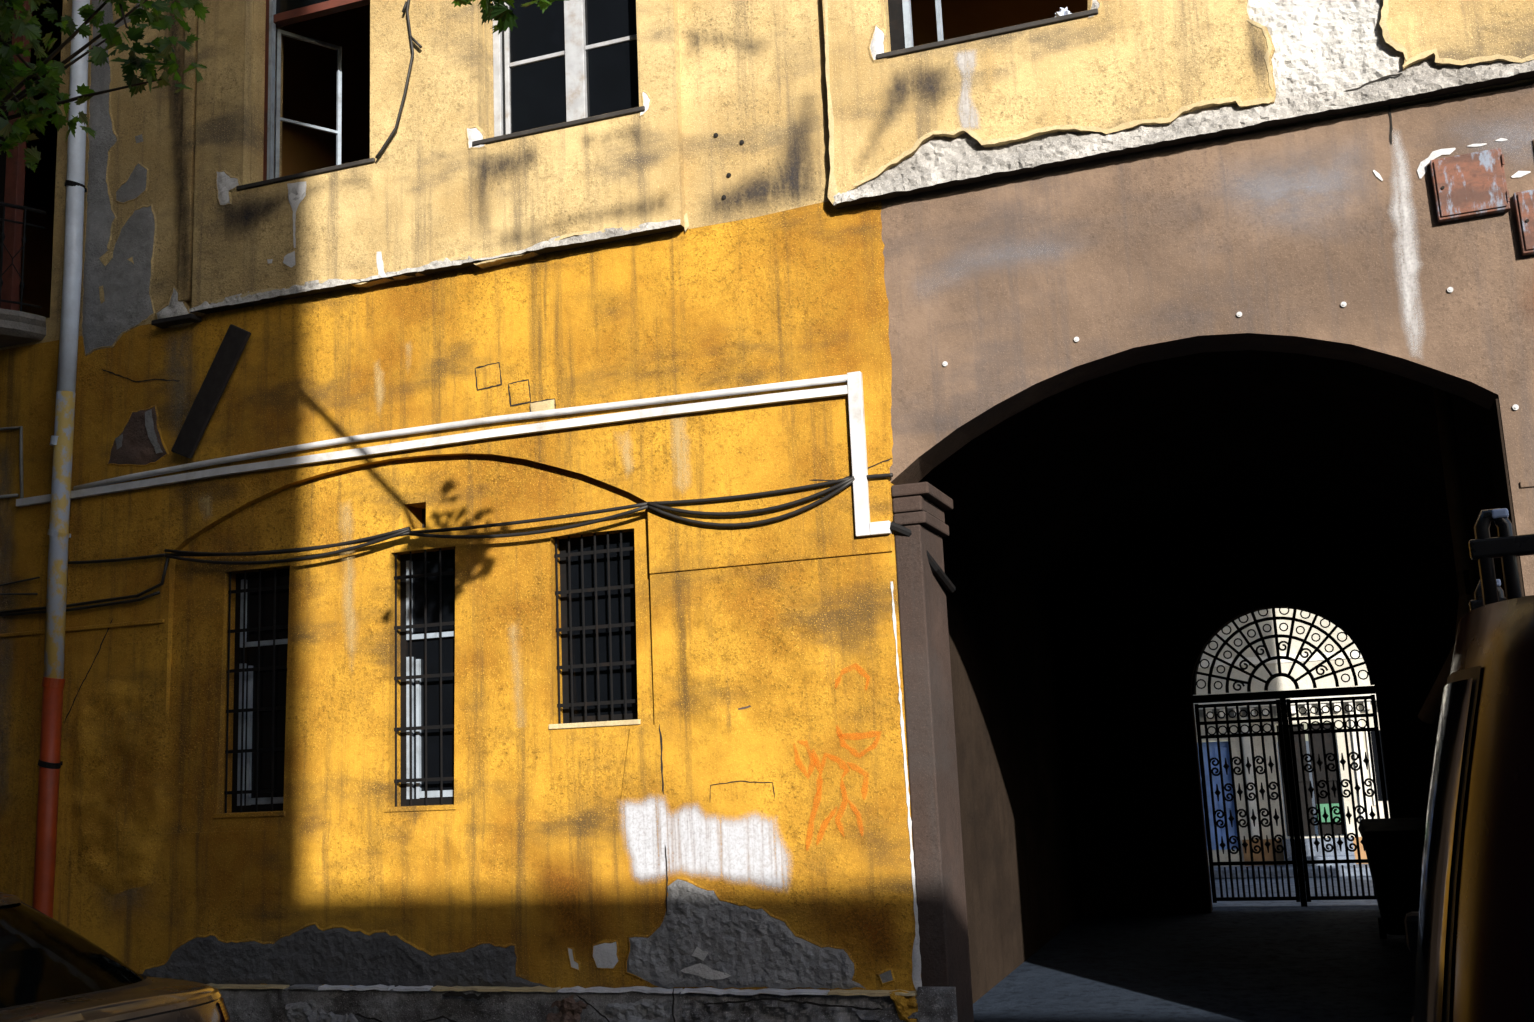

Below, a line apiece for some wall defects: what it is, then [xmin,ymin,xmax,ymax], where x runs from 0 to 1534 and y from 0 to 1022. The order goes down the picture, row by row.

peeling [81,0,689,356]
damp [715,123,809,208]
damp [891,72,941,109]
damp [957,51,992,127]
spalling [824,0,1534,209]
damp [1388,105,1418,346]
peeling [567,581,922,1022]
peeling [141,922,588,1022]